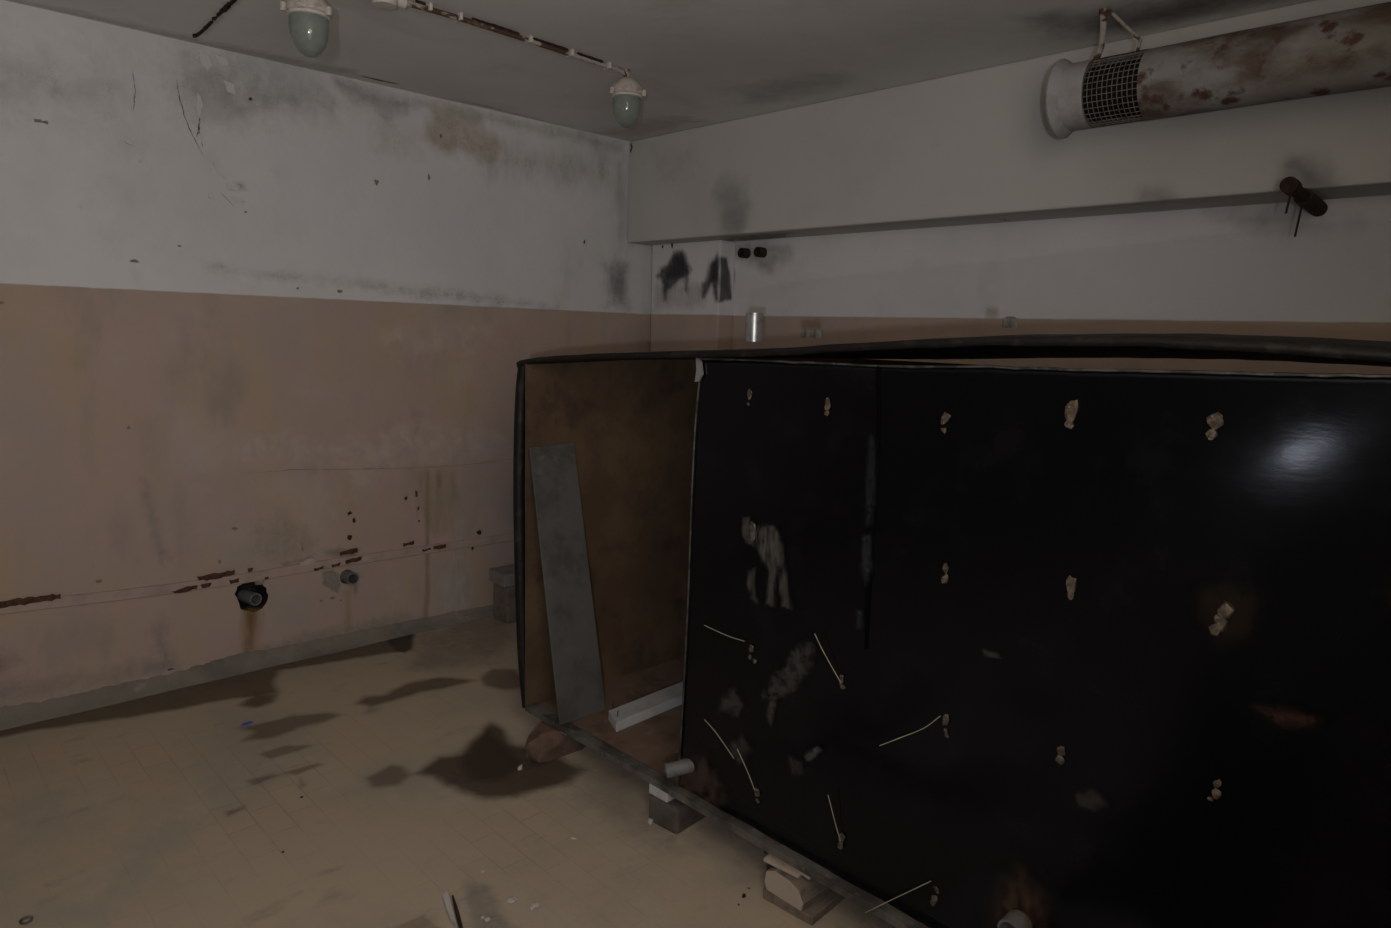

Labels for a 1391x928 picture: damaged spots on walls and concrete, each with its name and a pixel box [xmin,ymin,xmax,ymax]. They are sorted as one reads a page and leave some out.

rust [472,17,603,63]
damp [659,252,688,291]
damp [702,257,718,300]
rust [403,541,446,552]
rust [171,568,269,593]
rust [0,594,61,609]